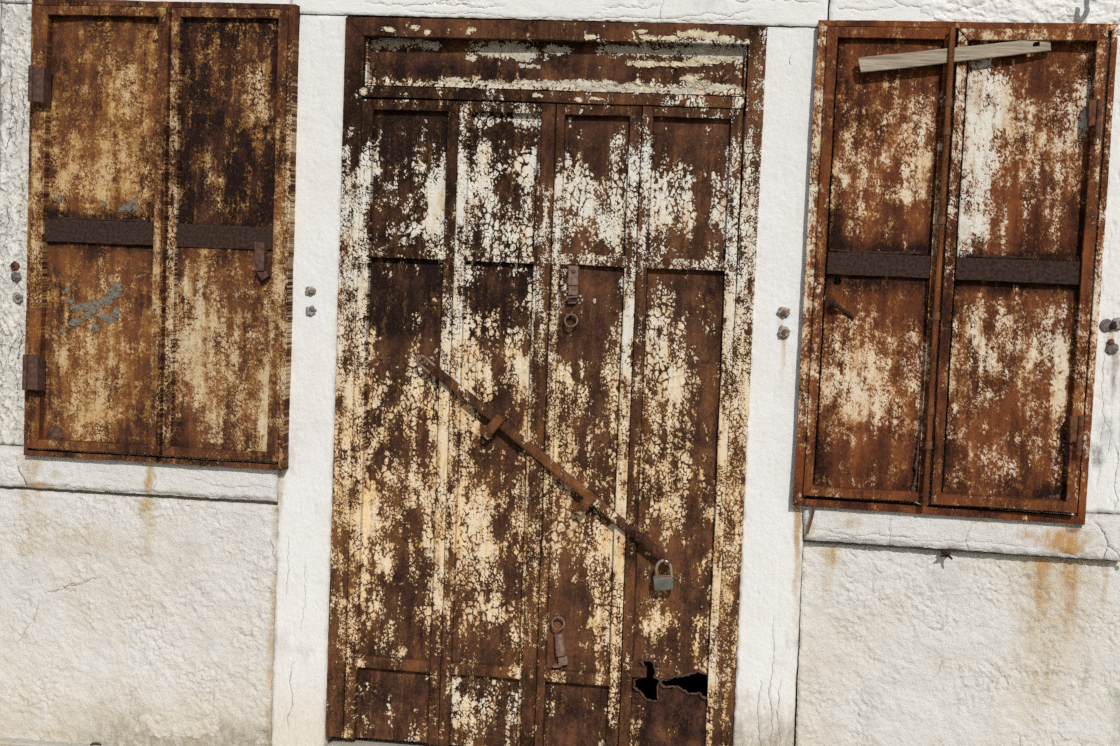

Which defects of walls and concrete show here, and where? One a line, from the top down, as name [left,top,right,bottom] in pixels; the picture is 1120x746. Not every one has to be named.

rust [1038,528,1079,594]